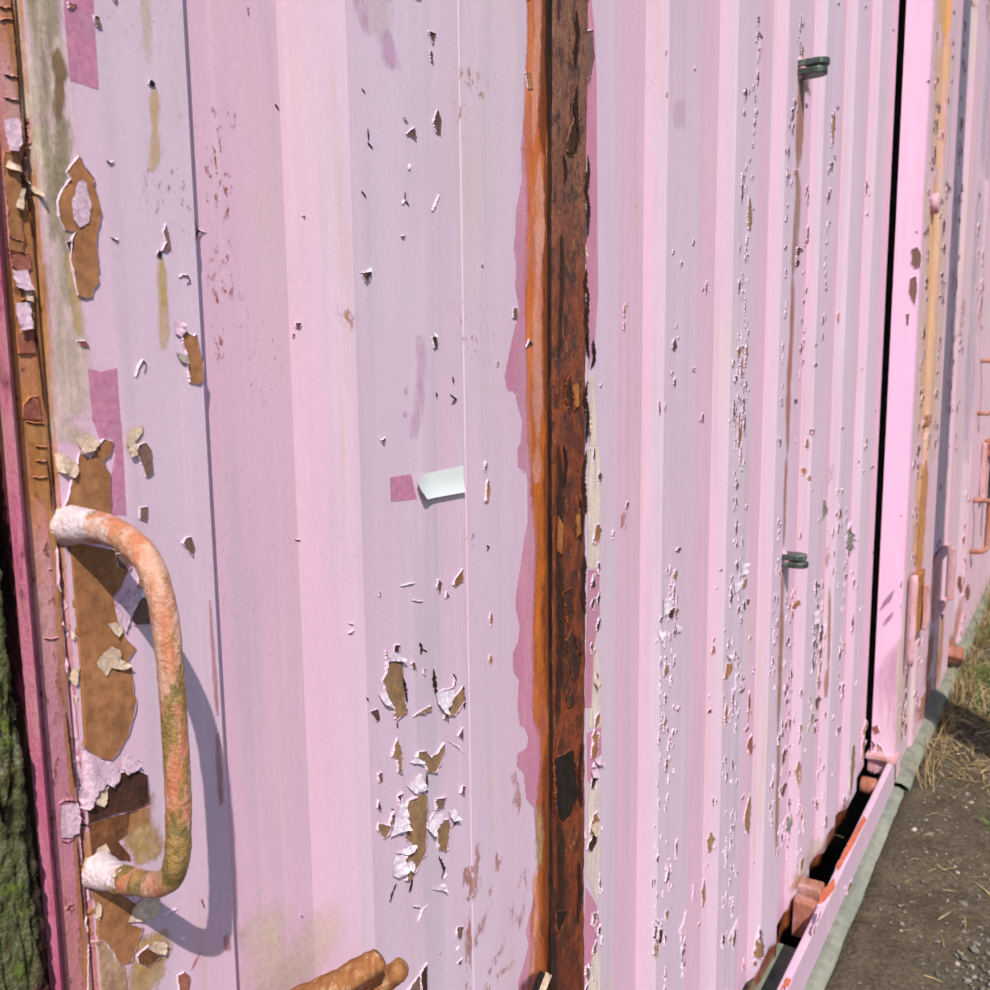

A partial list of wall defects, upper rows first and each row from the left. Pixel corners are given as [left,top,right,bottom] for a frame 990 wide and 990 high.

peeling [1,118,45,420]
rust [5,0,71,694]
peeling [56,156,102,348]
peeling [54,433,114,514]
rust [512,0,591,990]
rust [777,79,811,539]
rust [899,0,966,588]
peeling [55,544,151,861]
peeling [366,642,466,902]
rust [775,571,784,850]
rust [896,576,970,738]
peeling [84,888,177,990]